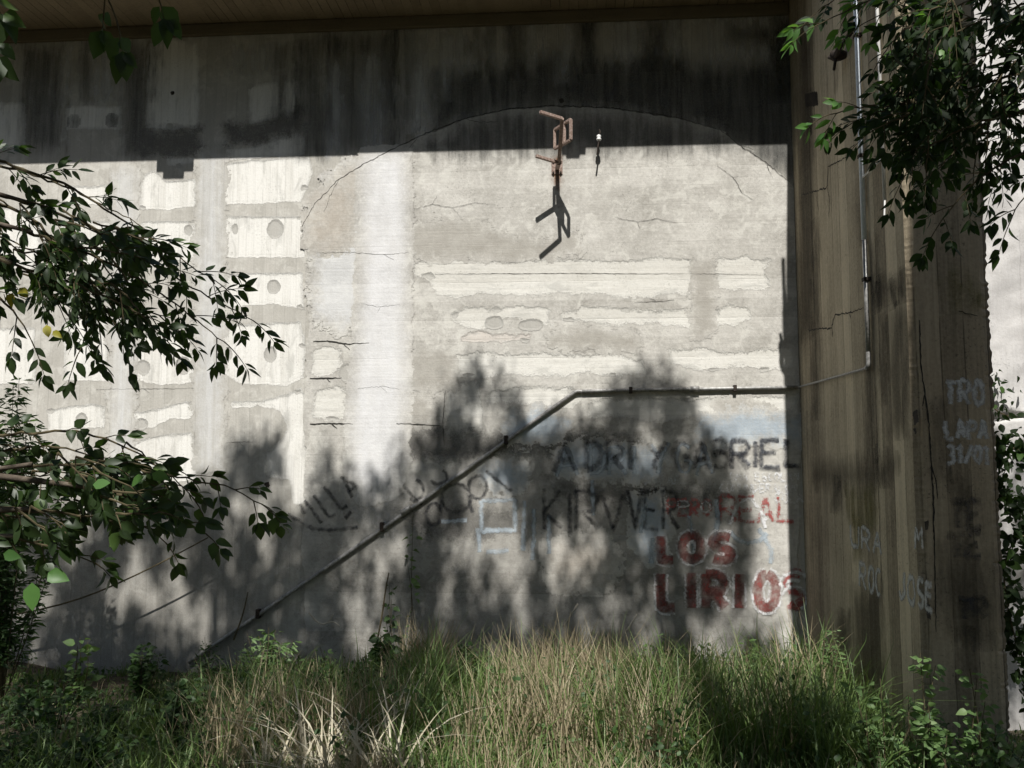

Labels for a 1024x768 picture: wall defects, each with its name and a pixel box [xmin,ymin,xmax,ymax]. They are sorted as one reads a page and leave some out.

damp [126,38,644,508]
crack [302,105,850,226]
crack [808,308,862,338]
crack [919,320,938,627]